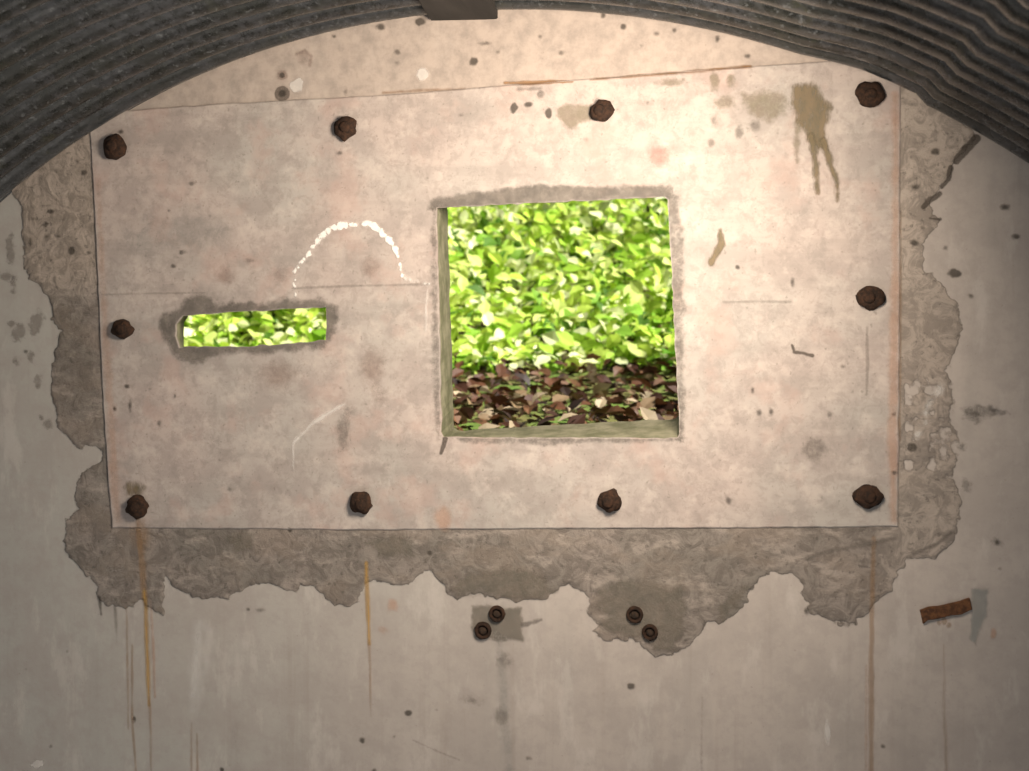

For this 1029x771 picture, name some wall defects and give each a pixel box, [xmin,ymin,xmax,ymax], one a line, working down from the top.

peeling [1,87,974,657]
damp [750,84,839,199]